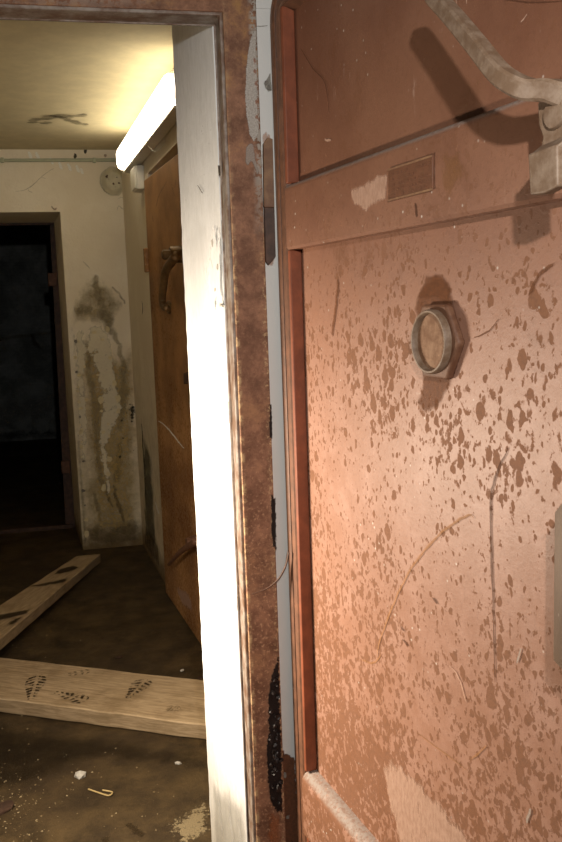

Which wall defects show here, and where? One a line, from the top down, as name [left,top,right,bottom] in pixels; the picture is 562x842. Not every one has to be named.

damp [85,345,159,563]